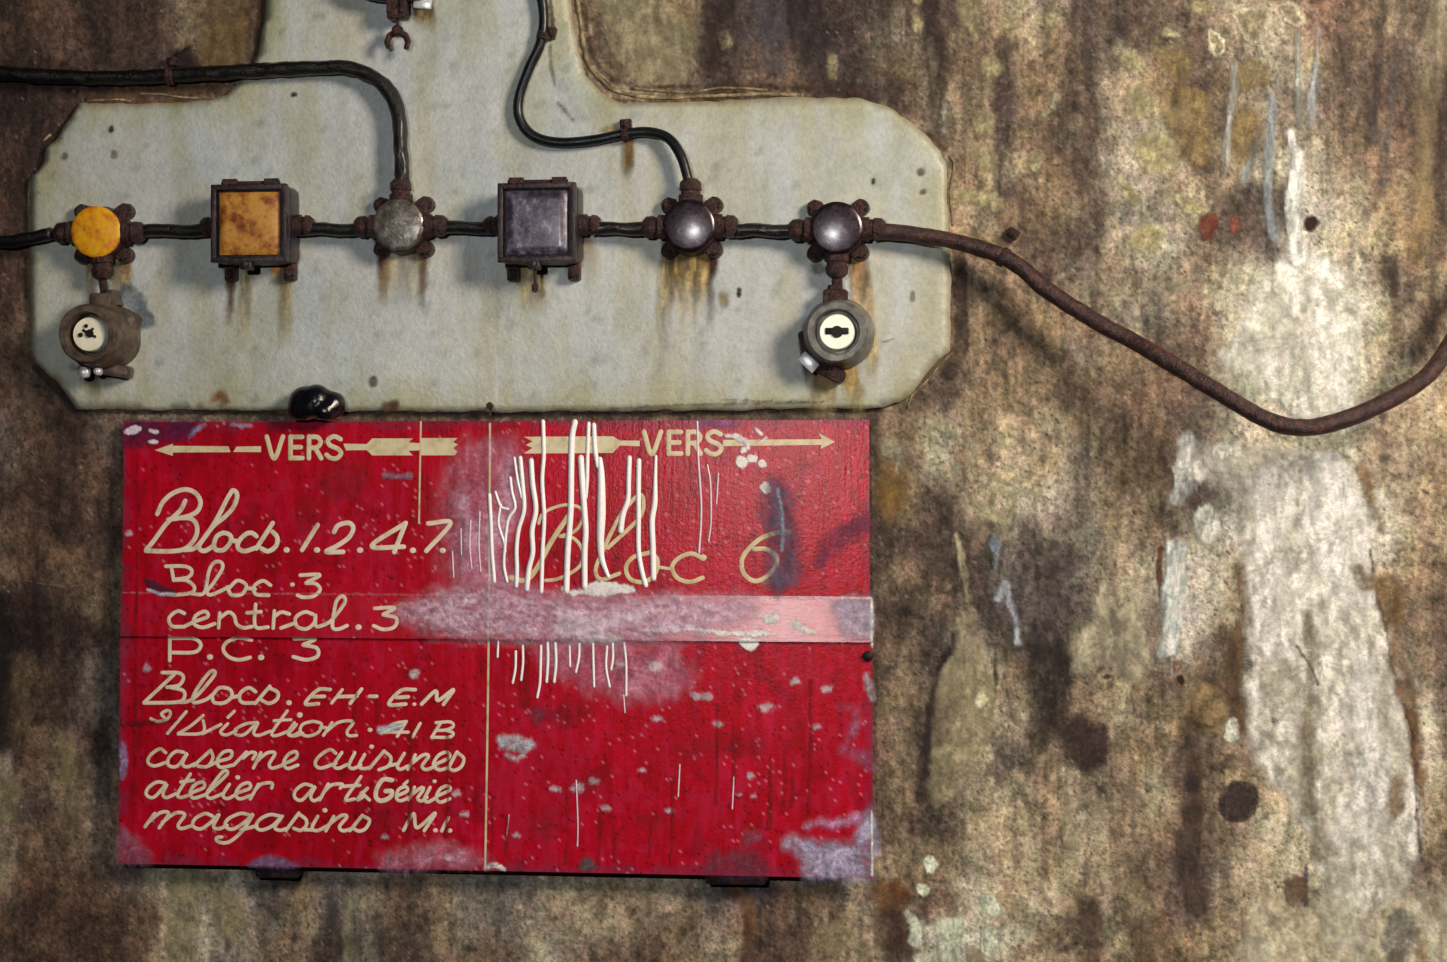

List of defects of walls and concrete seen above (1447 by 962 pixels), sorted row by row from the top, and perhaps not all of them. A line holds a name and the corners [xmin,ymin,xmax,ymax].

efflorescence [1213,31,1361,419]
corrosion [112,260,132,287]
corrosion [223,264,252,311]
corrosion [272,262,298,313]
corrosion [375,239,427,292]
corrosion [506,264,545,293]
corrosion [659,240,727,309]
corrosion [851,256,874,314]
corrosion [77,365,109,389]
corrosion [799,334,877,398]
damp [1033,650,1111,769]
damp [1157,432,1447,962]